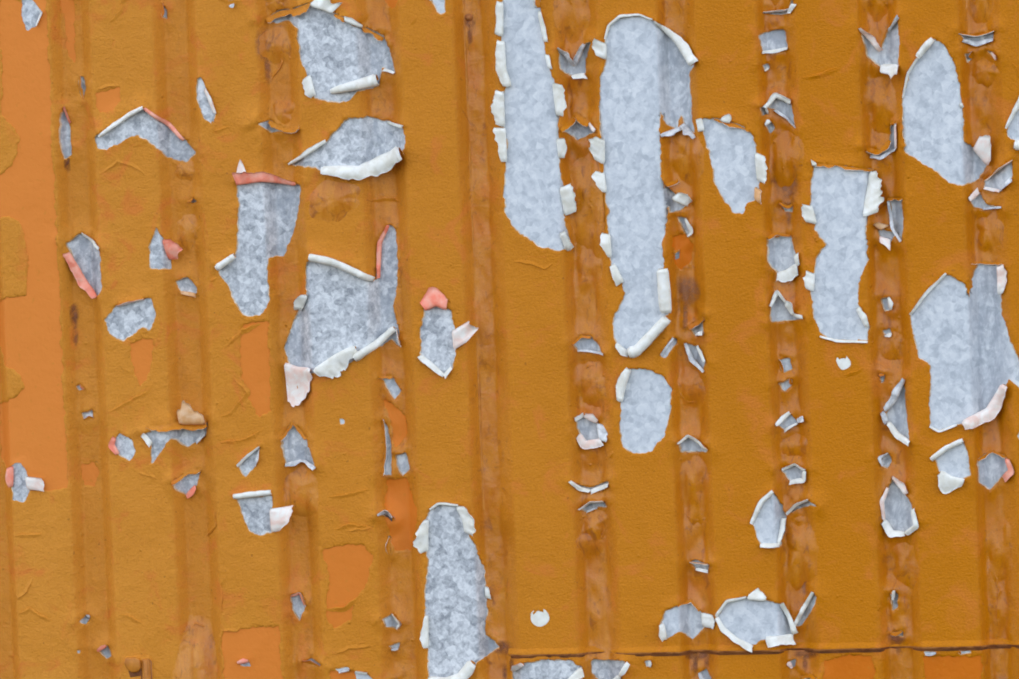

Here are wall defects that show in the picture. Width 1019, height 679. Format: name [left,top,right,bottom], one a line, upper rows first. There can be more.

peeling [79,76,195,162]
peeling [215,160,301,417]
peeling [265,0,395,102]
peeling [284,225,401,407]
peeling [288,117,405,180]
peeling [491,0,768,453]
peeling [768,15,1019,343]
peeling [880,378,910,446]
peeling [909,261,1019,494]
peeling [377,375,499,679]
peeling [511,659,630,679]
peeling [659,588,816,652]